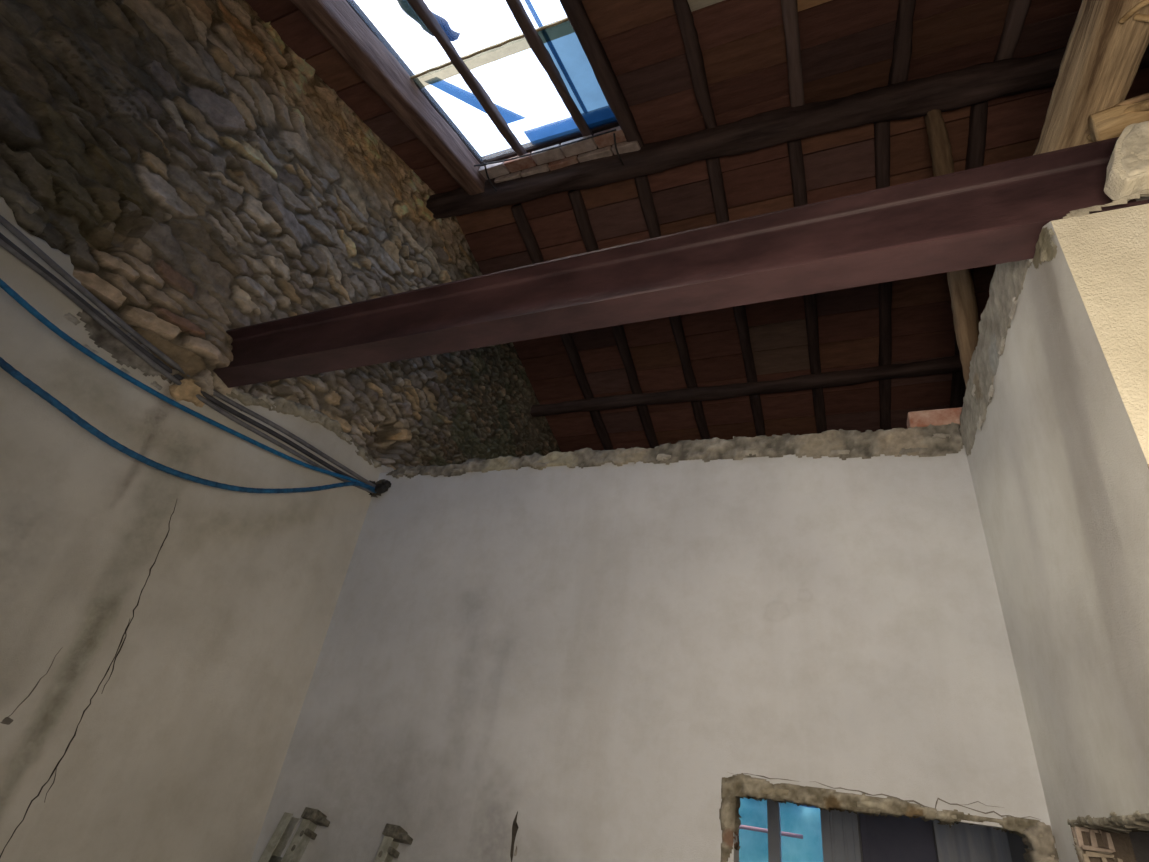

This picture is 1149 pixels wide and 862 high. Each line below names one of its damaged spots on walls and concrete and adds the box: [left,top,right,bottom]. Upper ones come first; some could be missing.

crack [0,500,177,858]